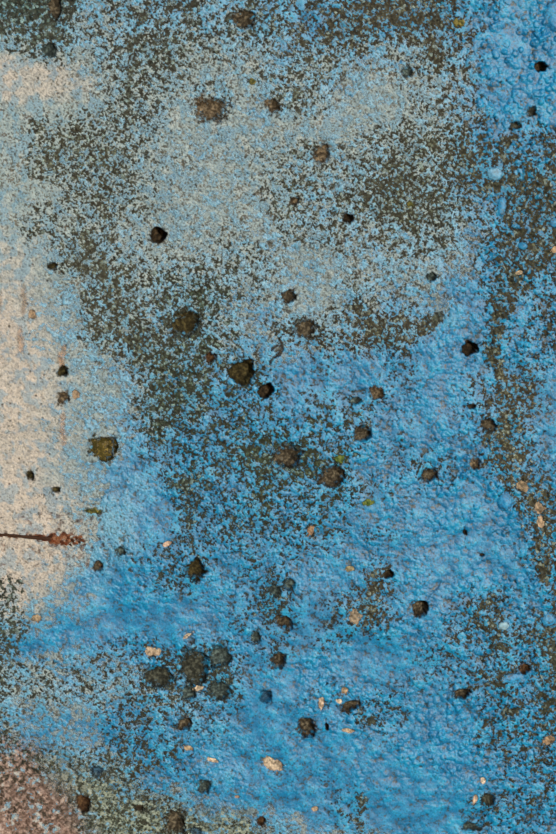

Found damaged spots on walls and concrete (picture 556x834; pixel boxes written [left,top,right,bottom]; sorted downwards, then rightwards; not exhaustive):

corrosion [0,532,86,547]